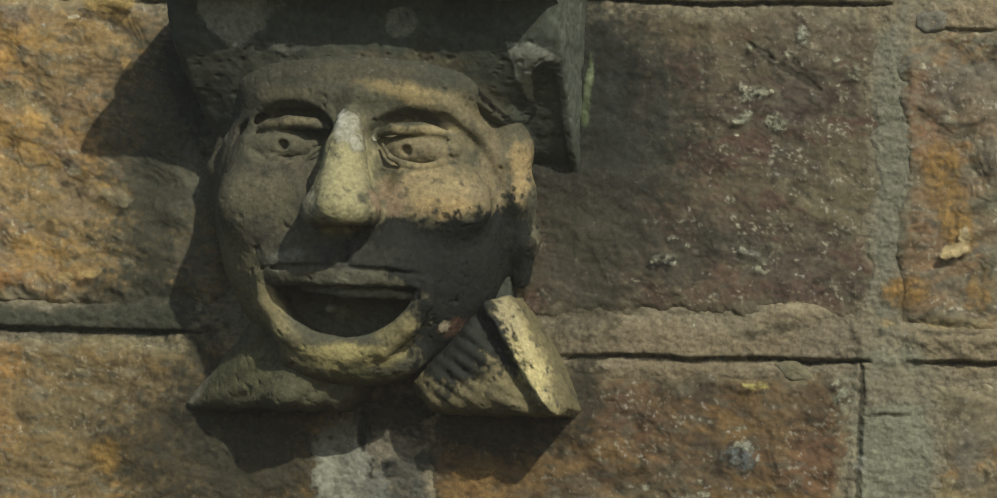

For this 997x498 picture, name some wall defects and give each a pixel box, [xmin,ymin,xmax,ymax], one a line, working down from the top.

leakage [0,14,232,337]
leakage [325,0,710,400]
spalling [507,42,561,100]
leakage [95,325,606,498]